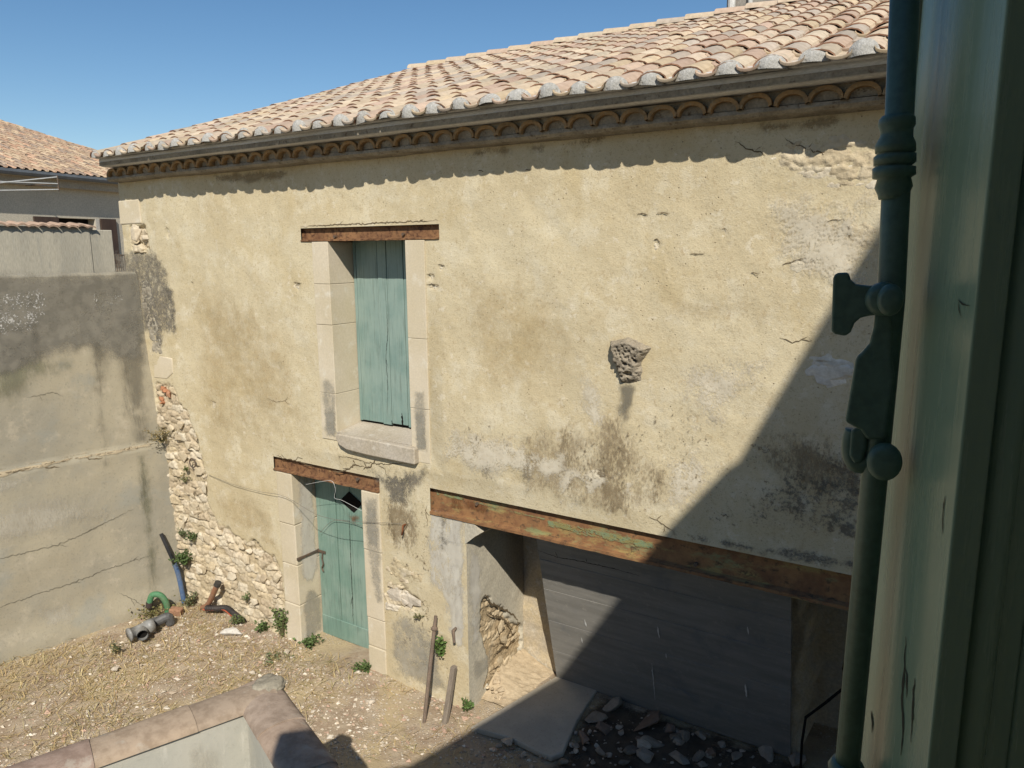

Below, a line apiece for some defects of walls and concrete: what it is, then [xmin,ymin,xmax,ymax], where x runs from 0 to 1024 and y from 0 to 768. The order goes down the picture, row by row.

flaking render [770,117,878,189]
flaking render [805,354,854,388]
damp [620,386,633,414]
crack [0,510,131,559]
flaking render [155,383,286,630]
crack [279,455,407,474]
damp [524,422,665,512]
damp [745,437,860,537]
crack [4,555,150,606]
flaking render [384,557,423,613]
flaking render [480,594,520,688]